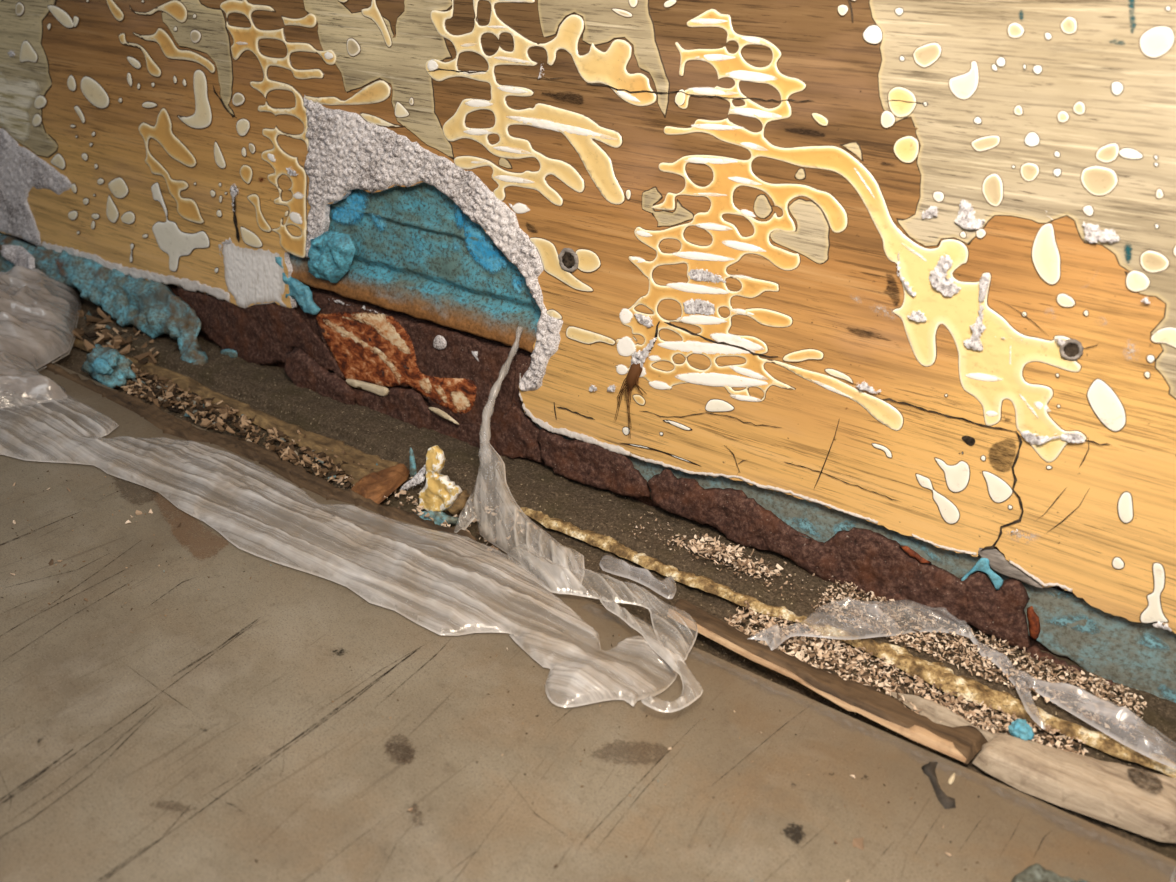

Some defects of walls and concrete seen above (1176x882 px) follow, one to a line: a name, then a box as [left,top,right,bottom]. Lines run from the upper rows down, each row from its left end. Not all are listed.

peeling [161,0,235,118]
peeling [537,0,670,118]
peeling [0,0,208,365]
spalling [222,0,563,391]
peeling [642,186,694,227]
peeling [770,198,830,265]
peeling [840,141,864,162]
peeling [869,0,1176,400]
spalling [400,445,470,527]
corrosion [178,286,1087,676]
crack [883,398,1110,551]
peeling [627,456,1176,703]